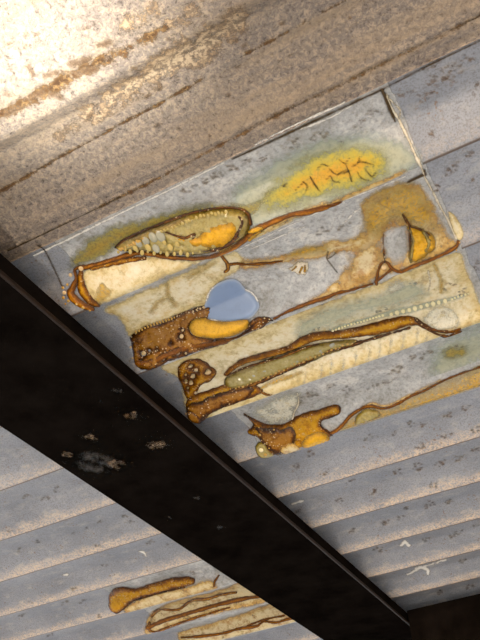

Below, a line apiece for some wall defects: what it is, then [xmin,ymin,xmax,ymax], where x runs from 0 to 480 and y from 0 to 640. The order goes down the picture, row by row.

corrosion [0,24,169,119]
damp [61,138,480,459]
damp [108,575,296,640]